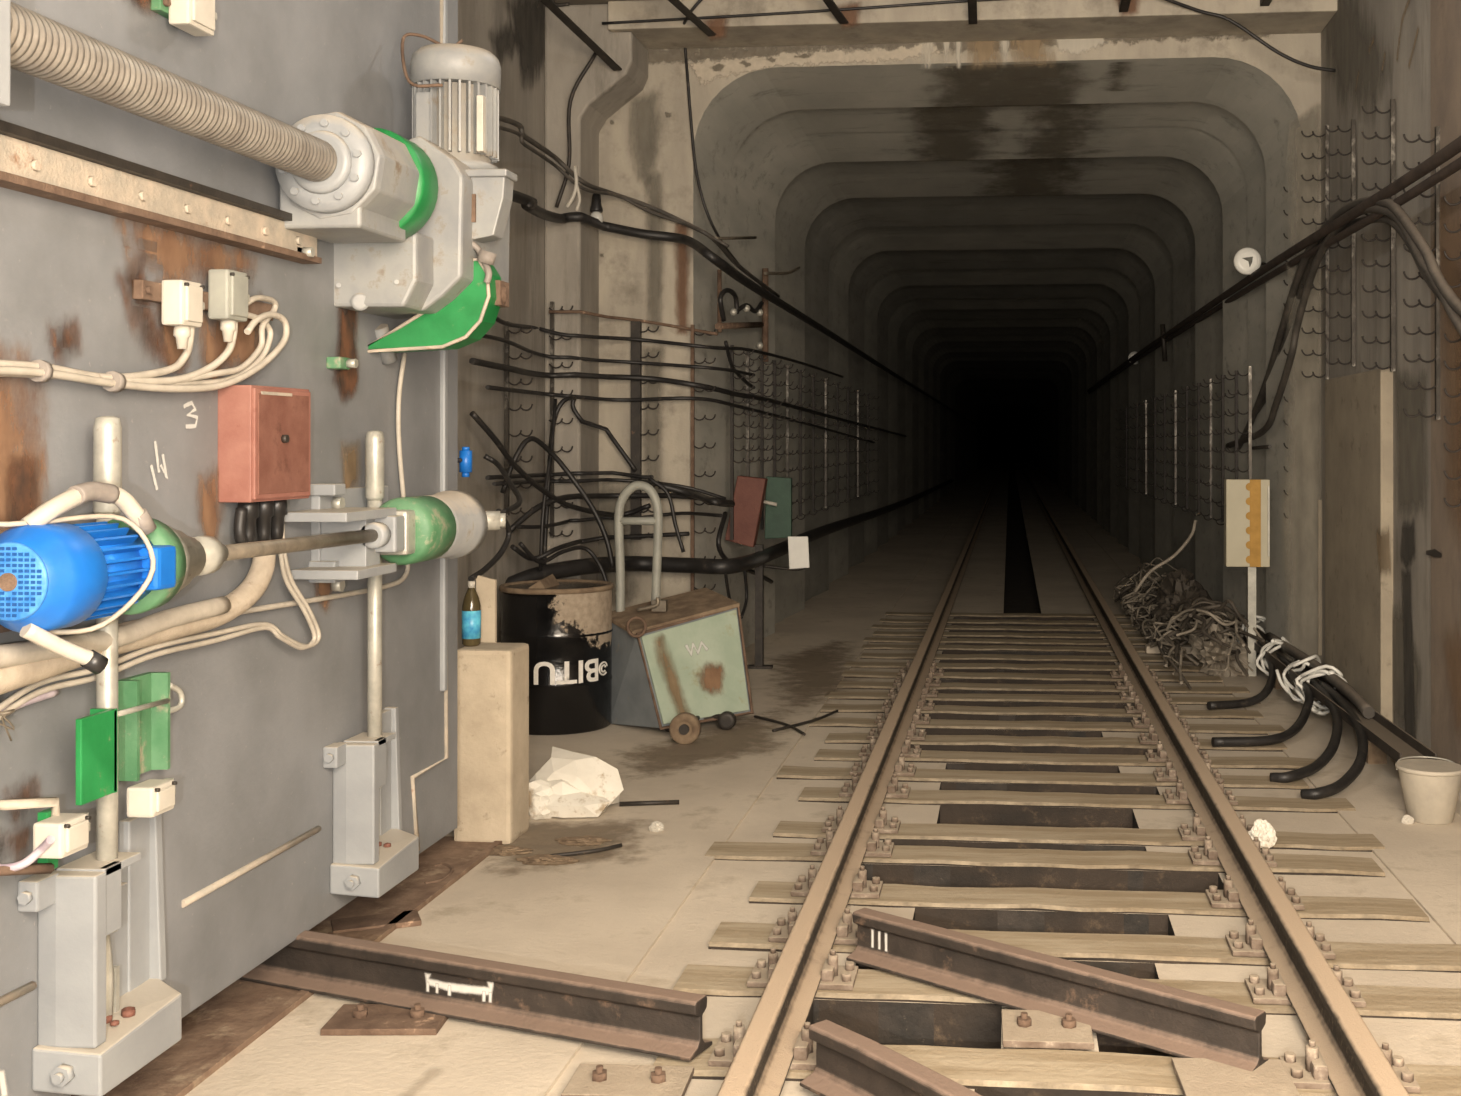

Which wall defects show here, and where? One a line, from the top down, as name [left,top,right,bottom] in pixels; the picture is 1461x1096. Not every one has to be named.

spalling [690,42,947,85]
leakage [647,34,1269,196]
rust [120,218,249,365]
rust [200,318,260,379]
rust [1439,218,1461,300]
rust [0,377,45,531]